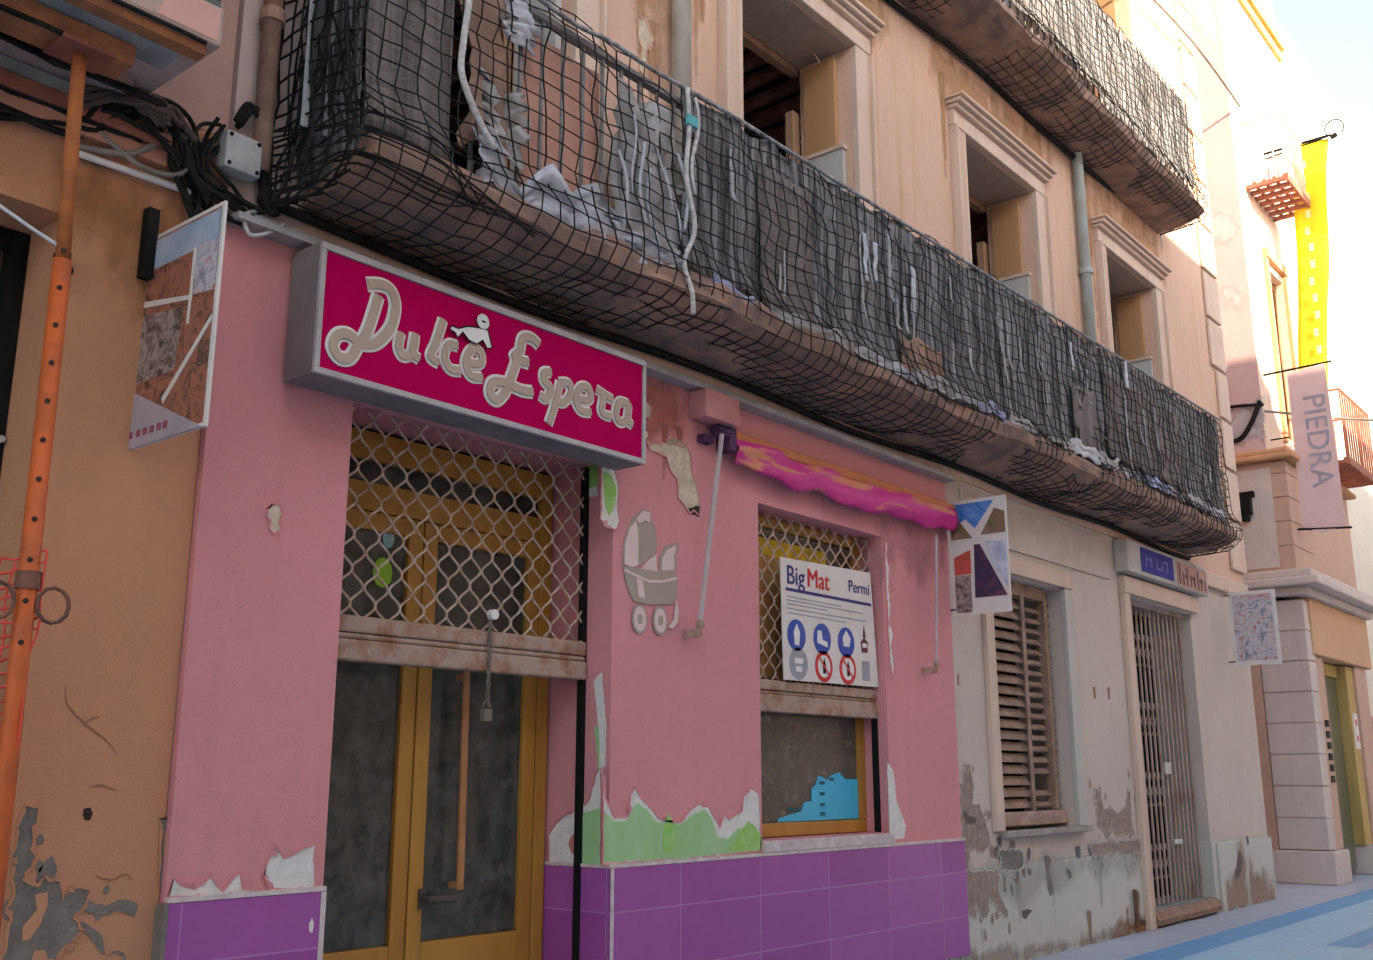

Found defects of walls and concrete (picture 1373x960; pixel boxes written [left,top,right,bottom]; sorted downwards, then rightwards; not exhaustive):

peeling [266,503,284,535]
peeling [646,402,701,517]
peeling [884,537,895,682]
crack [65,685,116,752]
peeling [0,803,317,960]
peeling [547,673,762,868]
peeling [887,763,906,839]
peeling [959,761,1141,941]